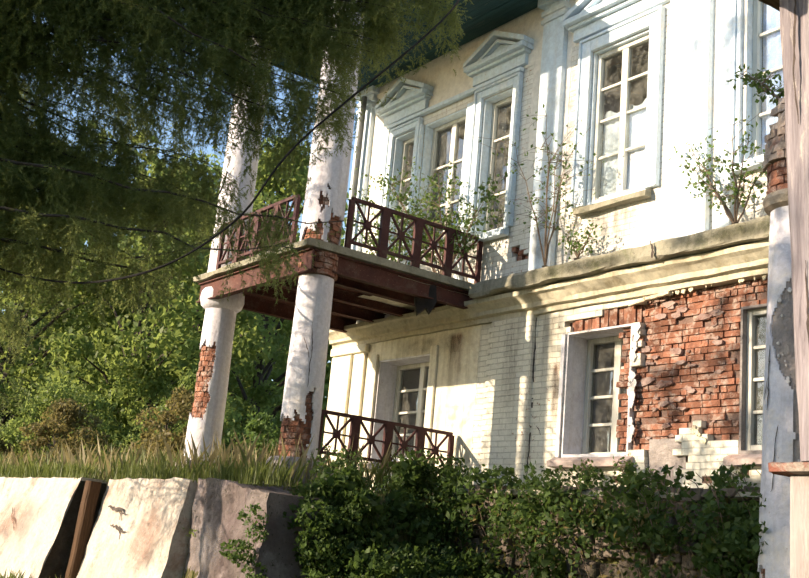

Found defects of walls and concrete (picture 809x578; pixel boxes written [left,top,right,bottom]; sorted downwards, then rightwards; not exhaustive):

crack [792,0,800,124]
flaking render [304,191,342,245]
flaking render [191,341,216,420]
flaking render [278,388,315,458]
crack [526,317,541,483]
flaking render [570,275,768,483]
flaking render [772,278,800,462]